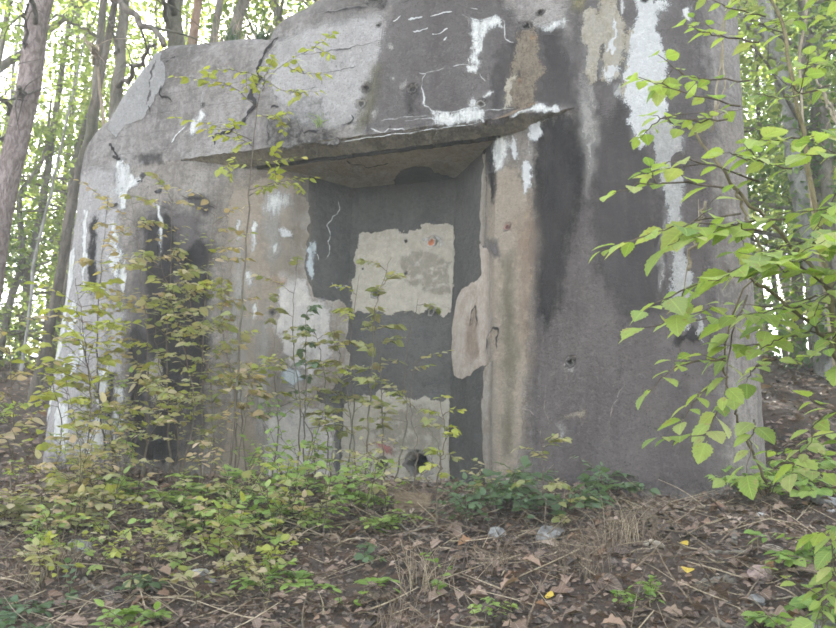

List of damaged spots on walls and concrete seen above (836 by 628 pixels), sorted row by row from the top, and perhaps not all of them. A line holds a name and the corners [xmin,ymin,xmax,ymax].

crack [146,56,175,111]
crack [212,6,370,145]
leakage [44,143,211,462]
leakage [217,175,302,480]
peeling [264,153,499,483]
leakage [266,0,725,499]